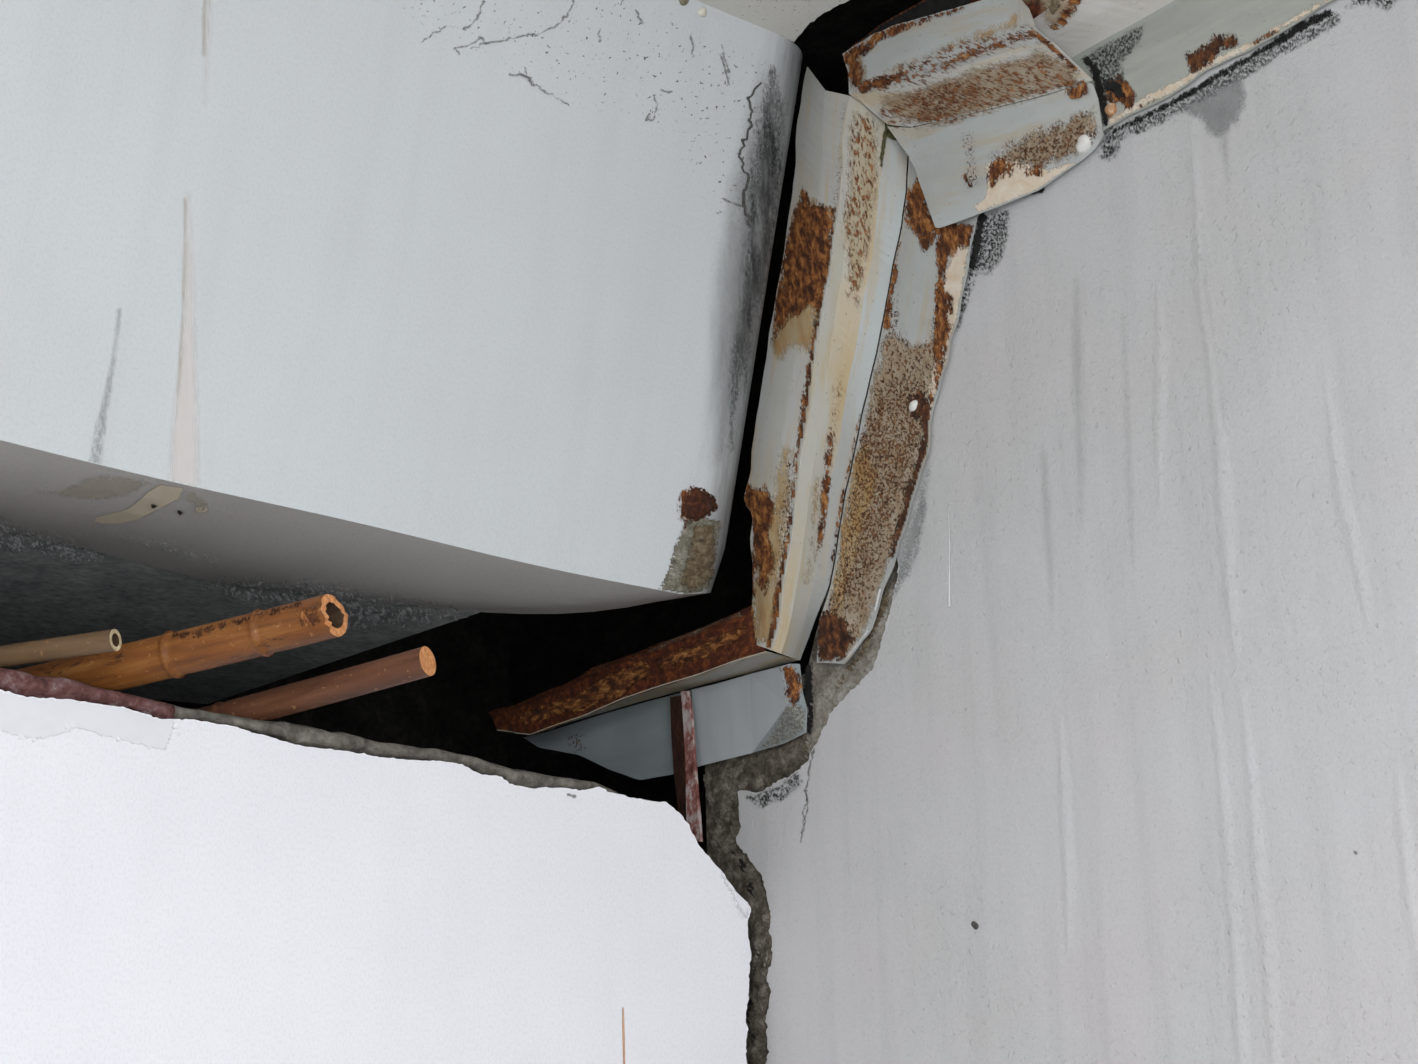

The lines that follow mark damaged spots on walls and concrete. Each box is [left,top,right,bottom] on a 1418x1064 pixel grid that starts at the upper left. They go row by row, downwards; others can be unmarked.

leakage [1101,10,1340,158]
crack [721,56,761,225]
corrosion [520,0,1154,725]
spalling [0,518,104,565]
spalling [658,486,722,594]
spalling [206,560,467,632]
peeling [0,691,181,750]
crack [801,748,815,839]